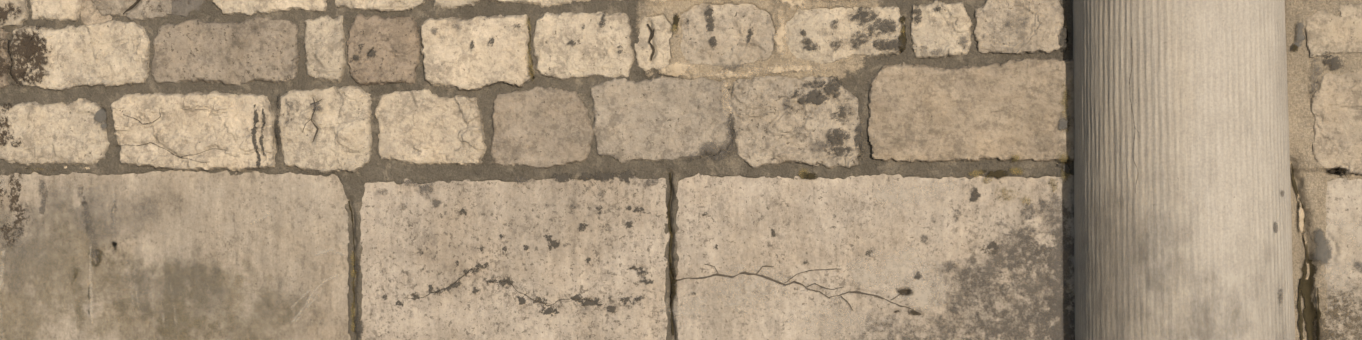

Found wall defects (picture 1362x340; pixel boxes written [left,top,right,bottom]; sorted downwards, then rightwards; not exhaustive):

water stain [0,173,47,245]
crack [383,261,919,316]